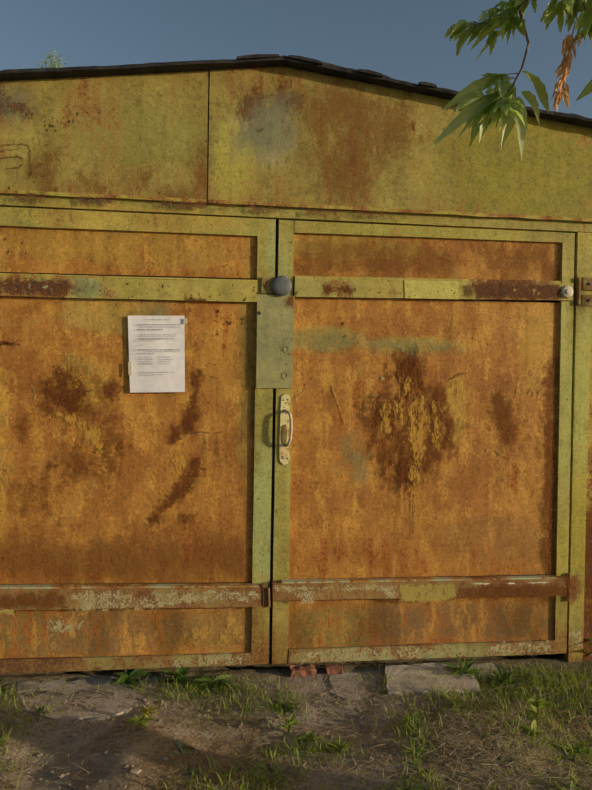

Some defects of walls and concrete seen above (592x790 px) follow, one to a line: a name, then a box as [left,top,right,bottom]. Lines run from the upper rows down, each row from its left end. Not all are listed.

rust [0,360,131,517]
rust [167,369,207,444]
rust [357,343,465,533]
rust [147,457,207,535]
rust [457,359,592,659]
peeling [70,589,261,613]
peeling [274,583,399,604]